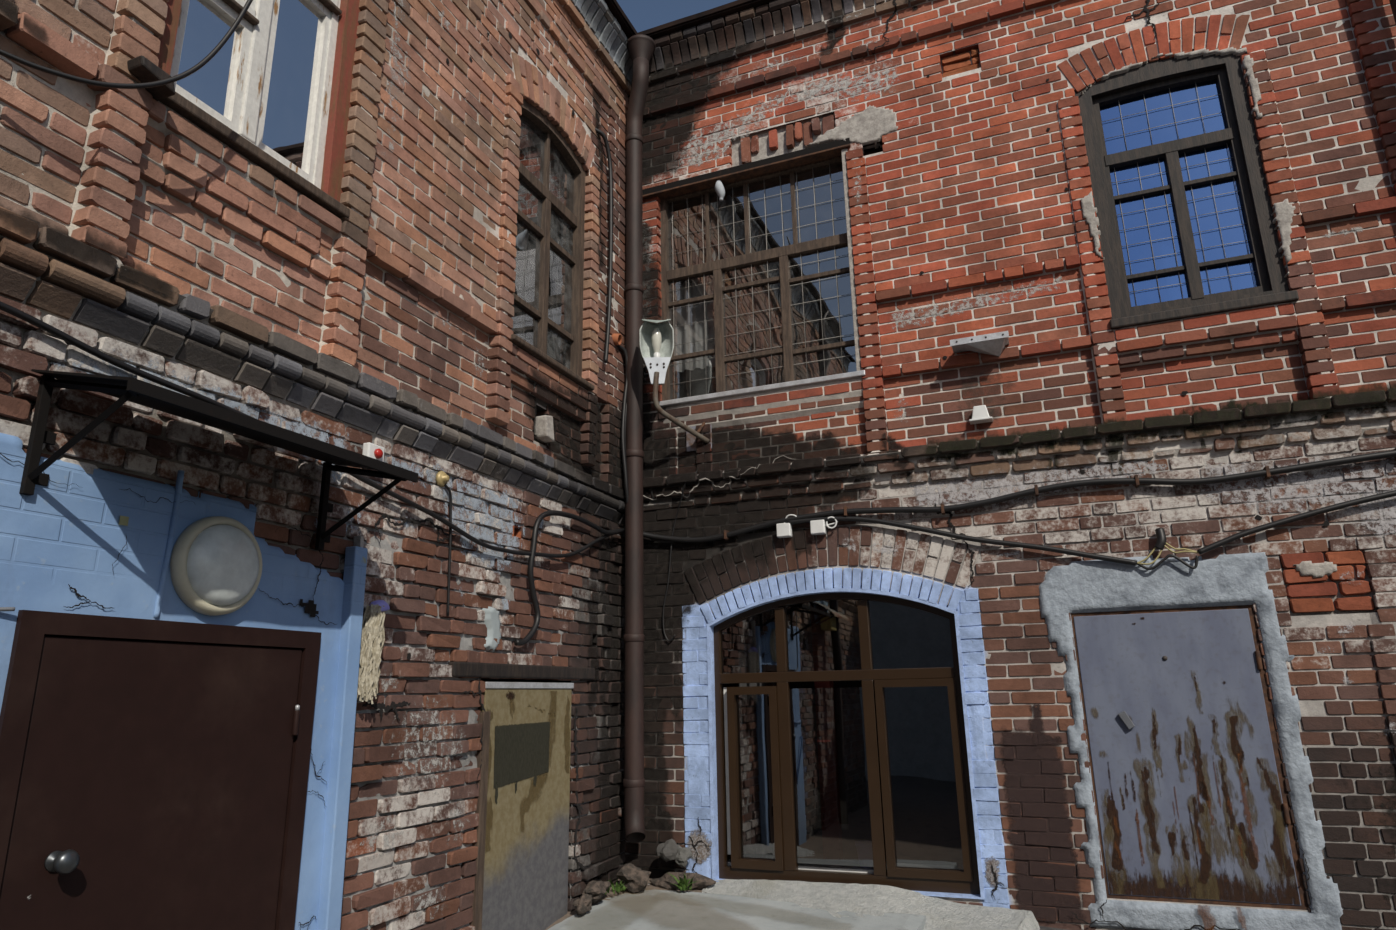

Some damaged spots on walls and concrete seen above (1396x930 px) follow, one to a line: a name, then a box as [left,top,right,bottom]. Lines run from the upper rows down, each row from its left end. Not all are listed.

crack [1125,0,1160,39]
spalling [731,112,835,167]
spalling [863,141,883,156]
peeling [51,353,349,448]
crack [0,453,78,486]
peeling [384,455,544,573]
peeling [908,458,1168,509]
peeling [1195,456,1396,538]
crack [64,584,112,609]
spalling [299,599,319,617]
peeling [398,701,466,840]
rust [1100,672,1300,930]